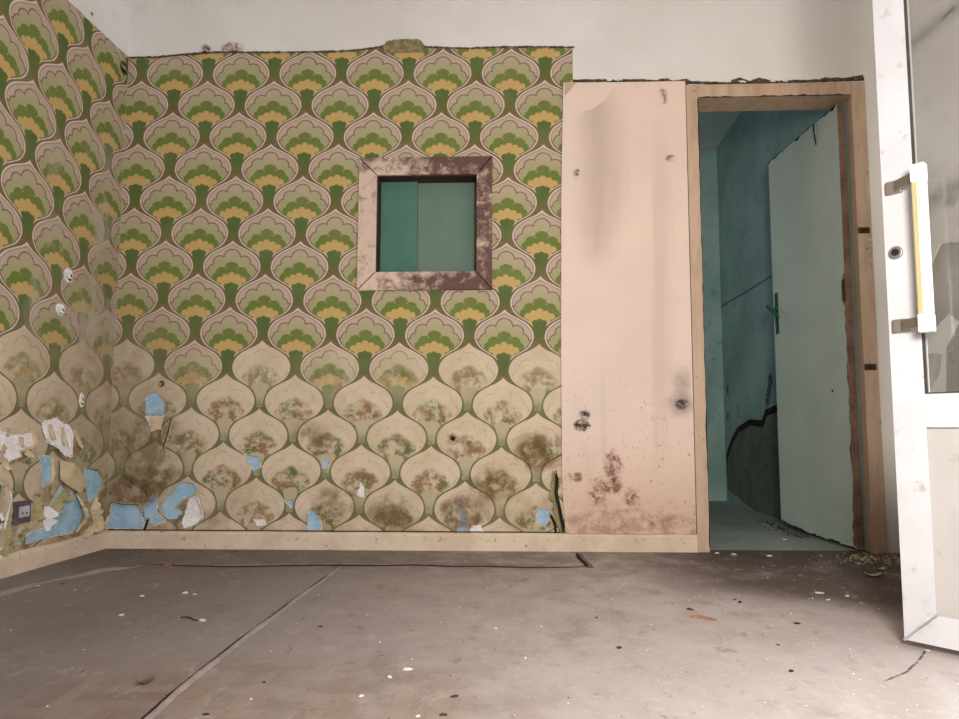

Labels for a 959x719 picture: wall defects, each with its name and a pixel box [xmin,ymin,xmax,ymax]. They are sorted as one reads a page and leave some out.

spalling [63,268,73,283]
flaking render [928,240,959,392]
peeling [145,381,165,432]
leakage [574,411,590,431]
peeling [244,453,263,471]
leakage [521,435,558,468]
flaking render [727,374,784,521]
peeling [0,418,204,558]
peeling [307,508,323,530]
crack [550,470,565,534]
crack [0,553,594,719]